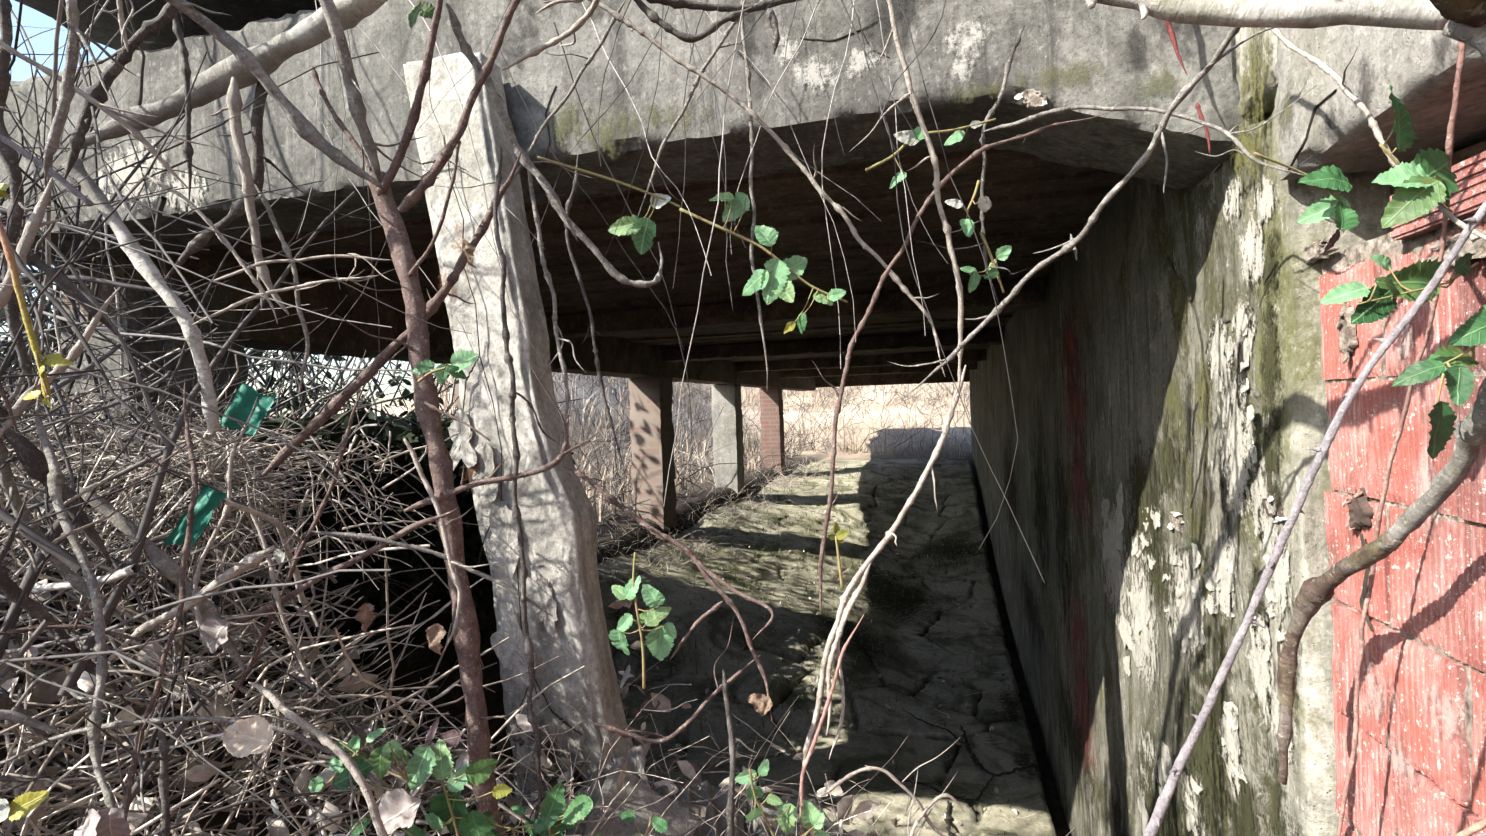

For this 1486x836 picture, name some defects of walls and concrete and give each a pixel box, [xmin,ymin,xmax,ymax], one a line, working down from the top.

leakage [776,0,916,92]
leakage [945,21,985,79]
peeling [448,410,558,686]
peeling [1098,482,1287,693]
peeling [1226,312,1257,495]
leakage [1207,174,1297,763]
crack [1360,534,1374,631]
crack [898,709,1040,836]